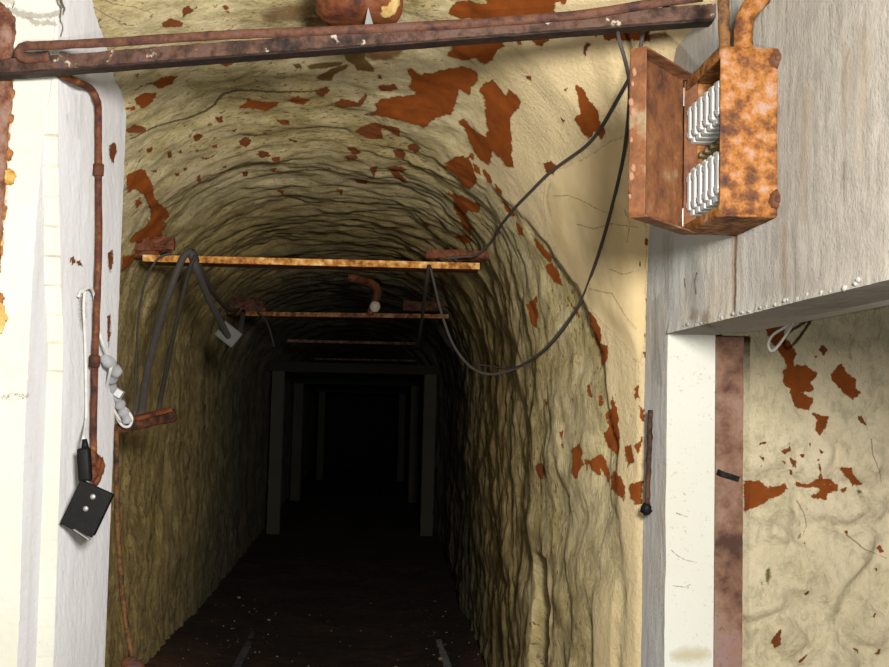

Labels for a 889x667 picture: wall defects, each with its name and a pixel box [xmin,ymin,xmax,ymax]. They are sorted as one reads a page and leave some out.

peeling [448,0,567,19]
peeling [238,86,329,111]
peeling [232,129,280,171]
peeling [335,43,562,286]
peeling [126,169,169,243]
peeling [122,253,136,271]
peeling [766,326,829,436]
peeling [831,364,861,400]
peeling [559,384,644,505]
peeling [743,443,862,512]